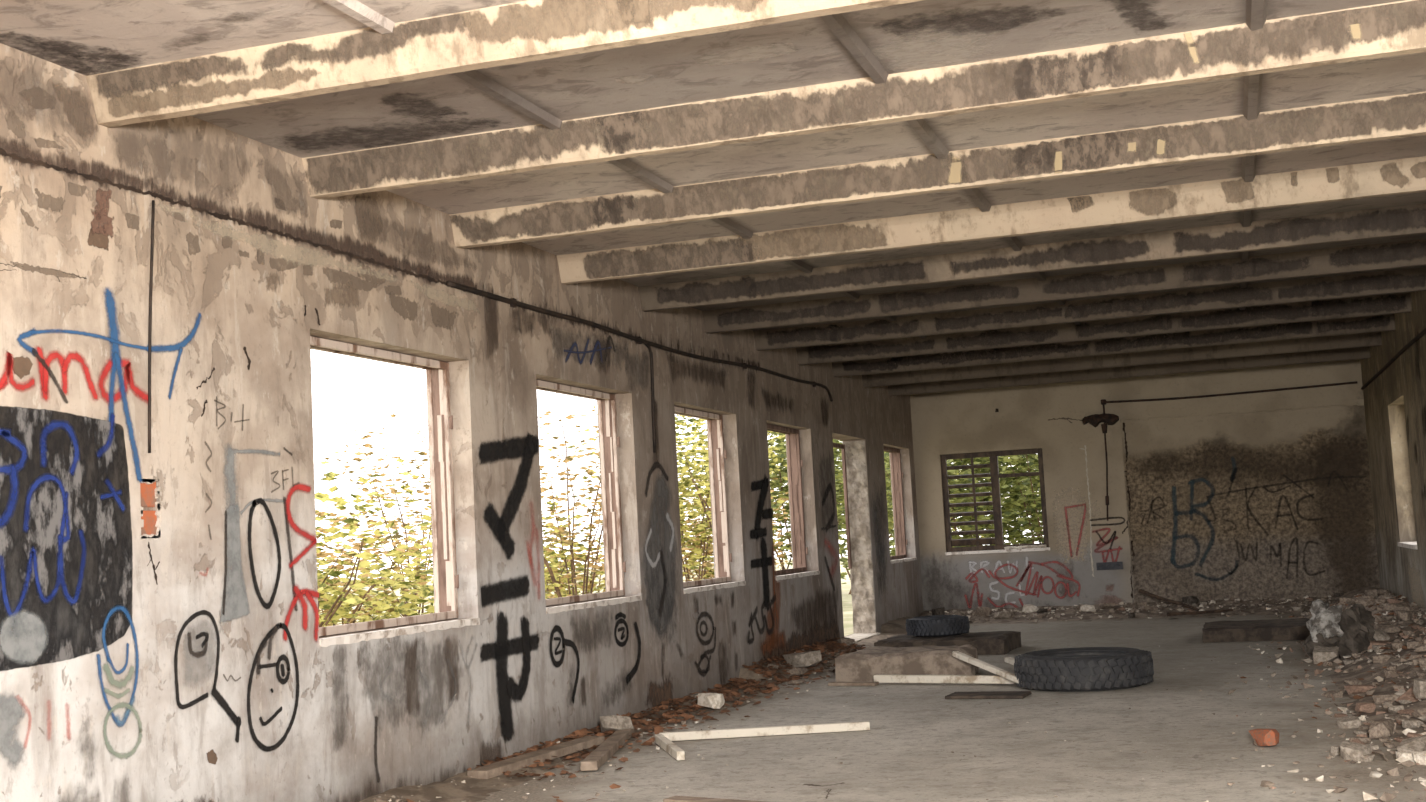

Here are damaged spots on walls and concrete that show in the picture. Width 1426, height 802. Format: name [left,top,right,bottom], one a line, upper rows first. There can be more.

flaking render [880,29,983,72]
crack [0,148,481,296]
flaking render [330,195,383,246]
flaking render [174,212,456,330]
crack [196,347,251,417]
flaking render [140,479,161,539]